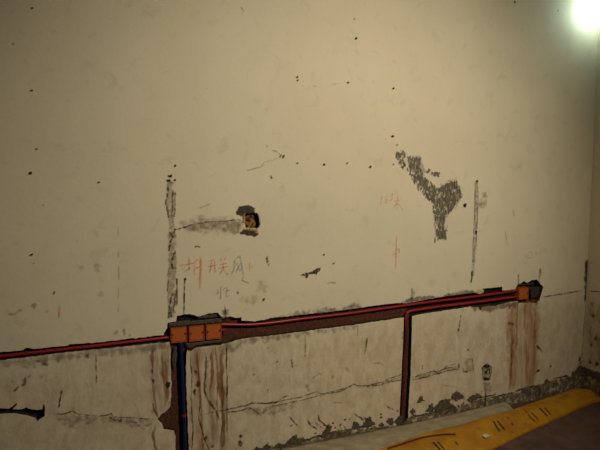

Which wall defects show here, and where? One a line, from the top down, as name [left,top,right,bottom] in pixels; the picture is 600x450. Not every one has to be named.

spalling [237,205,261,237]
corrosion [190,347,228,450]
crack [207,358,474,414]